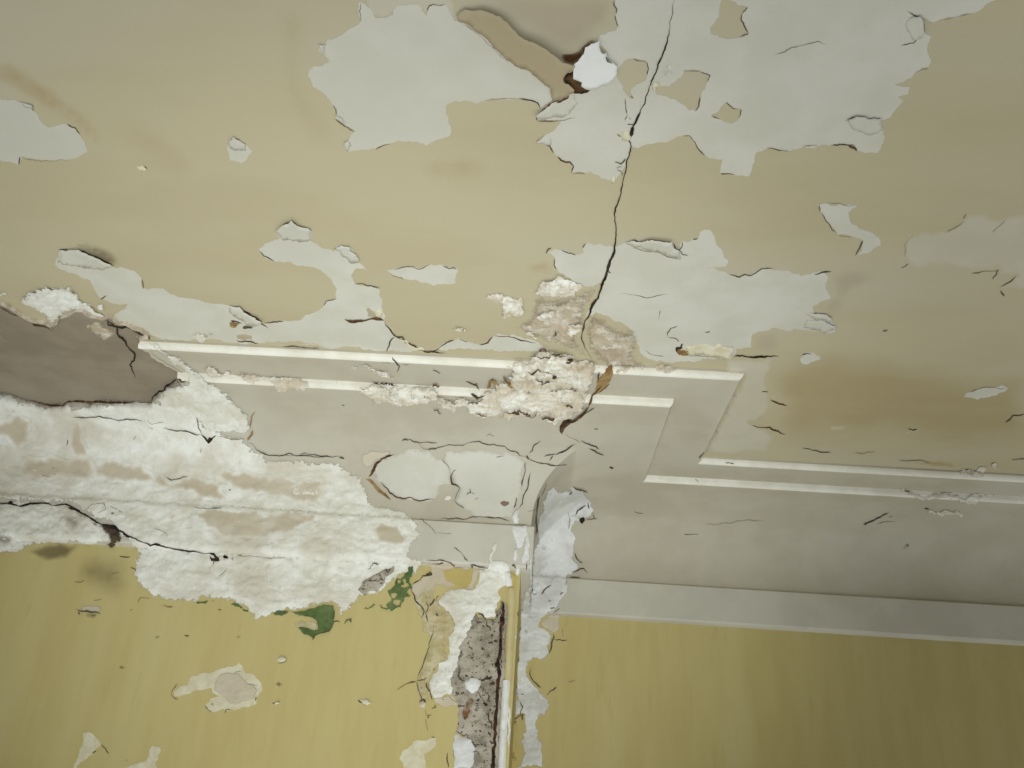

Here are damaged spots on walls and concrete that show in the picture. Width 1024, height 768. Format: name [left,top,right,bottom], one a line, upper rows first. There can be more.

peeling [0,98,87,165]
peeling [308,0,995,181]
peeling [819,203,881,255]
peeling [901,212,1024,296]
flaking render [0,221,421,539]
crack [397,6,673,729]
peeling [351,229,837,455]
leakage [735,329,1024,469]
crack [0,501,286,576]
spalling [358,566,394,595]
peeling [171,663,263,714]
spalling [412,544,518,768]